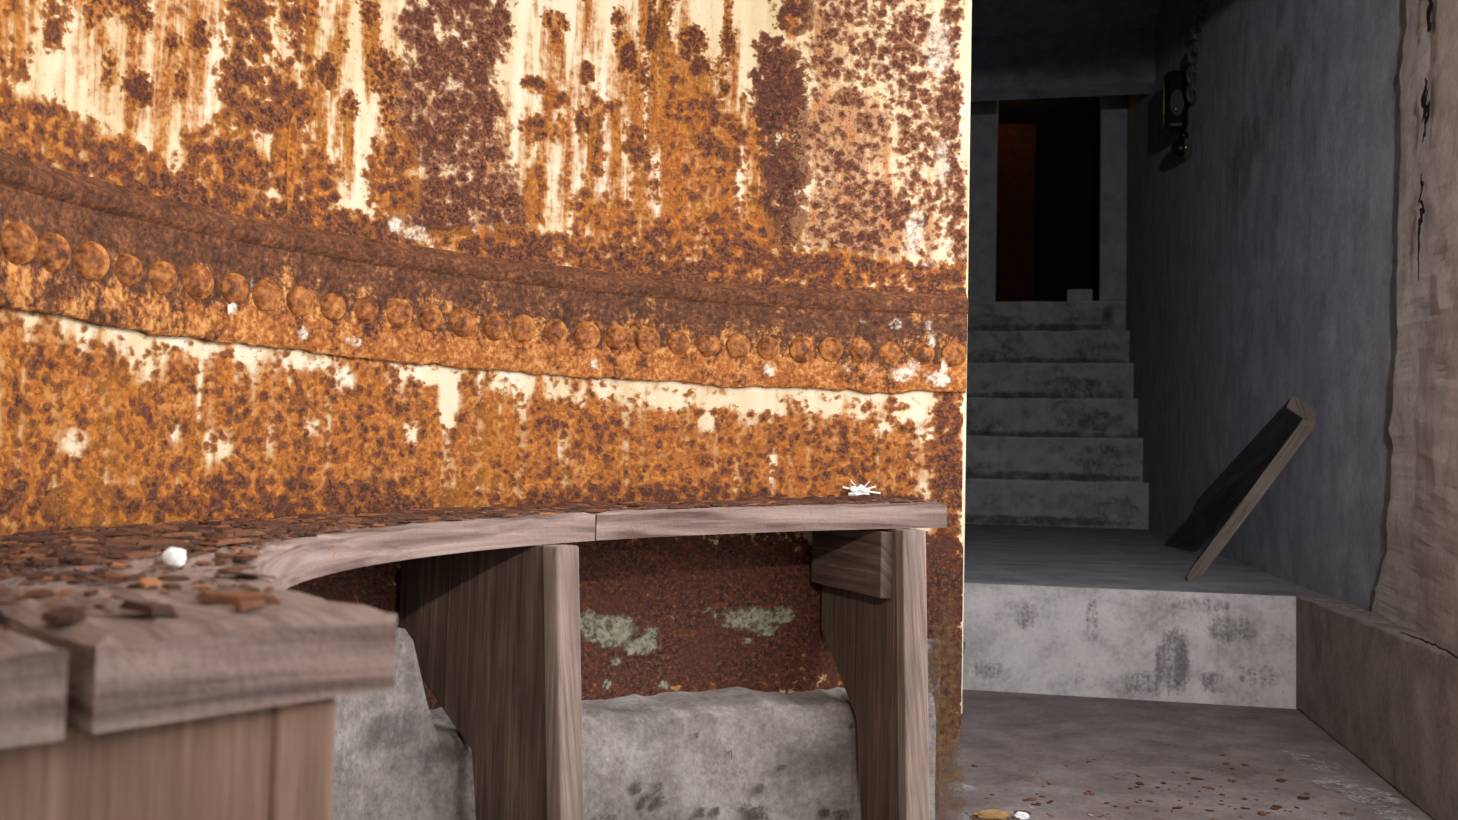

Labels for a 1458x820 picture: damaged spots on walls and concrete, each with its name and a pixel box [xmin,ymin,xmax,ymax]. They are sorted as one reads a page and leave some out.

rust [0,0,968,294]
rust [0,307,990,820]